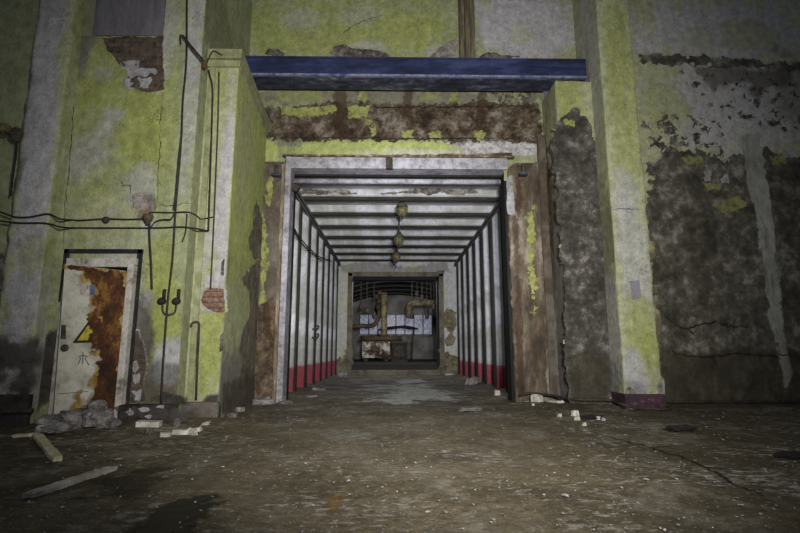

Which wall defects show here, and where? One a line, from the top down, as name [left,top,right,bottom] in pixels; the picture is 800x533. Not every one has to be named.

flaking render [101,33,167,95]
corrosion [65,265,127,410]
flaking render [129,328,149,404]
flaking render [200,285,228,315]
corrosion [254,298,276,398]
corrosion [265,100,553,401]
crack [664,314,756,335]
peeling [637,52,800,394]
damp [662,134,800,404]
crack [670,351,796,364]
crack [595,432,764,496]